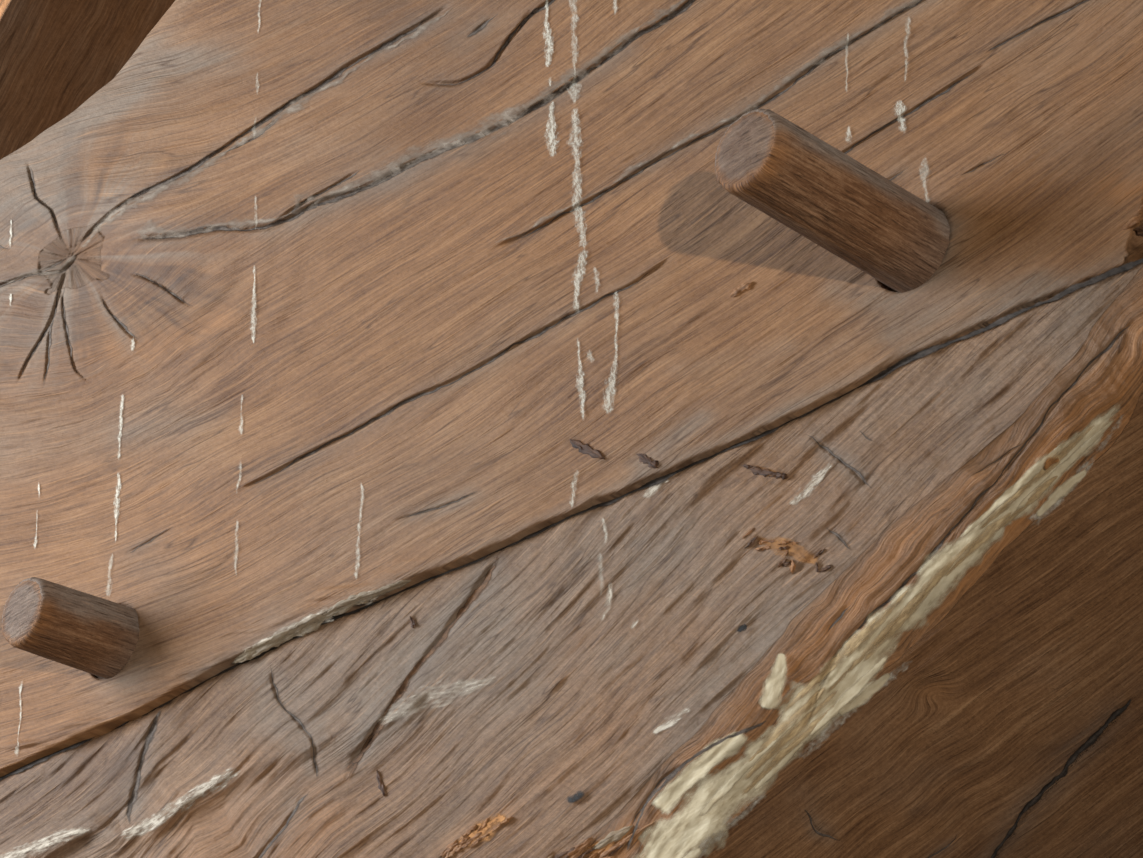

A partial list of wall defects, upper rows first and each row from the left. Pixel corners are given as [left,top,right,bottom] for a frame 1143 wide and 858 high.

crack [0,0,695,380]
water stain [544,0,553,66]
water stain [546,102,557,156]
water stain [573,110,587,309]
crack [505,0,922,239]
crack [845,75,970,154]
crack [255,275,645,484]
crack [819,327,1128,686]
crack [126,713,159,822]
crack [345,557,497,779]
peeling [554,408,1115,858]
crack [991,699,1131,858]